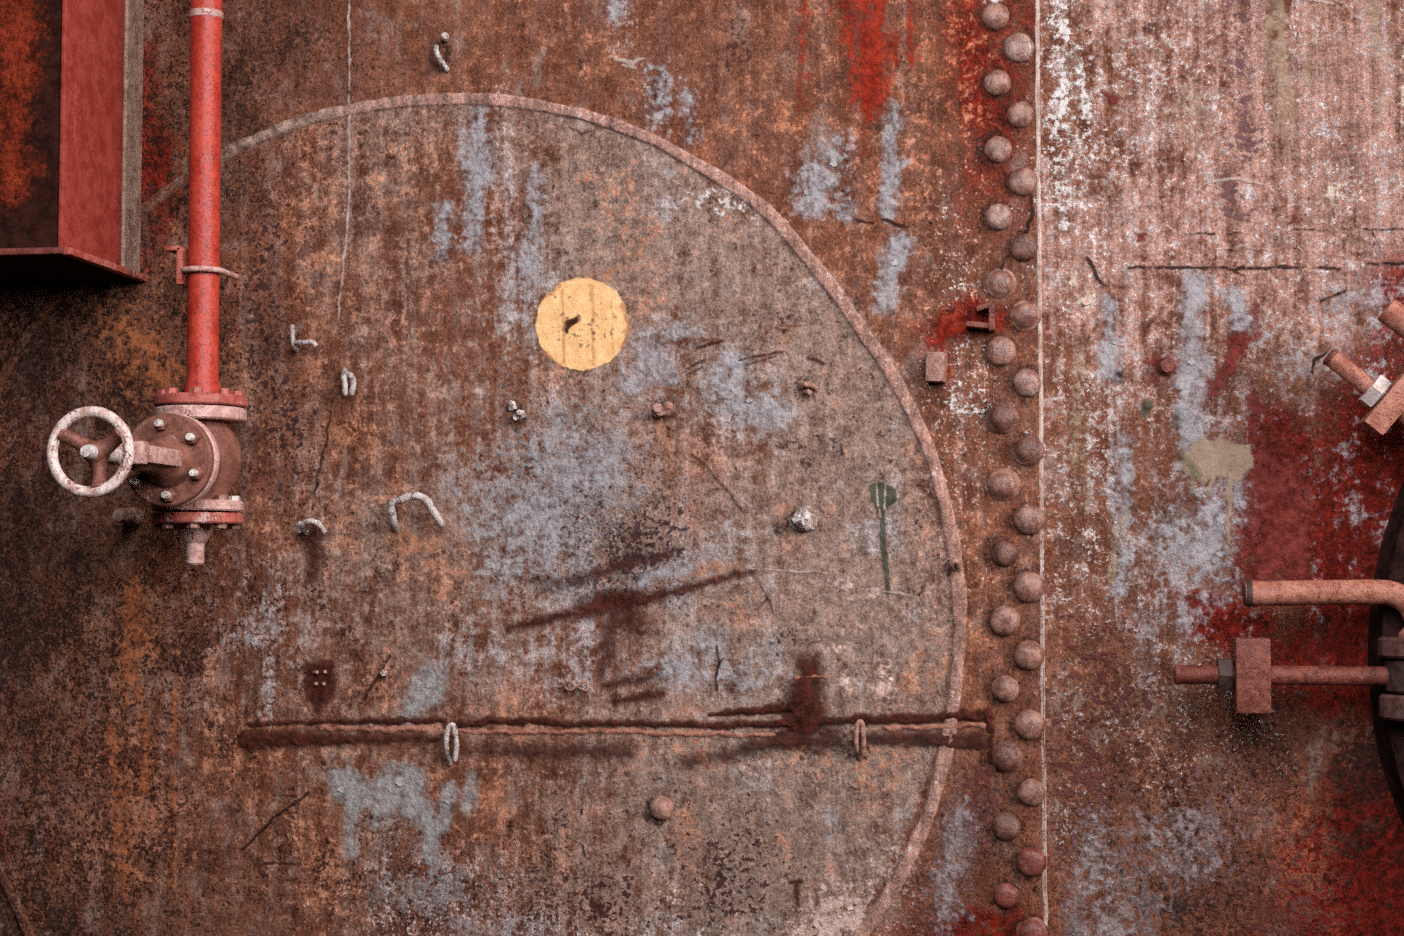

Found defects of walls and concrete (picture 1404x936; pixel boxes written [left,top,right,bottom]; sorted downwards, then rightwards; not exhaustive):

corrosion [0,0,46,204]
peeling [785,136,856,221]
peeling [872,104,916,314]
peeling [1042,0,1096,242]
corrosion [221,144,329,583]
peeling [1175,269,1253,470]
corrosion [396,394,755,703]
peeling [1110,435,1247,612]
corrosion [303,659,338,715]
peeling [330,765,477,872]
corrosion [361,781,816,936]
corrosion [1029,568,1375,936]